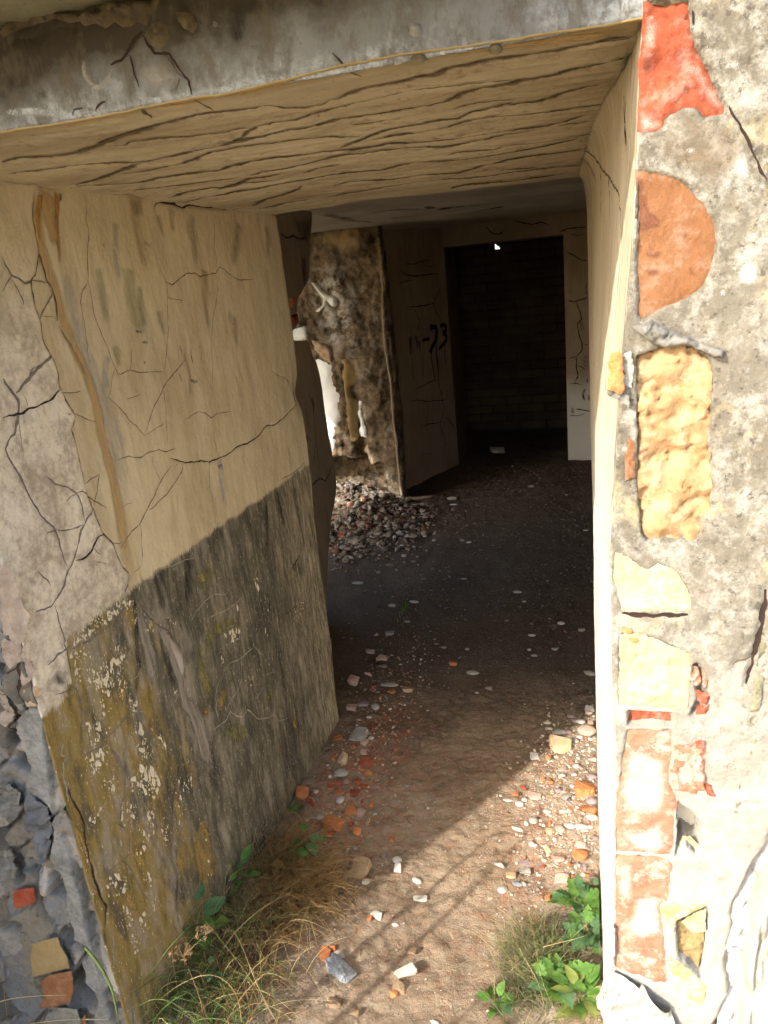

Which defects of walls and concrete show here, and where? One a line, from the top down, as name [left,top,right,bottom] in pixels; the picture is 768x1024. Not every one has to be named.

crack [110,31,214,118]
crack [586,151,621,211]
spalling [635,169,715,319]
spalling [637,1,724,132]
crack [729,106,767,180]
spalling [636,345,712,541]
crack [0,195,296,923]
spalling [613,552,691,612]
damp [120,605,211,765]
damp [58,756,96,906]
spalling [596,628,716,1024]
flaking render [30,937,86,1024]